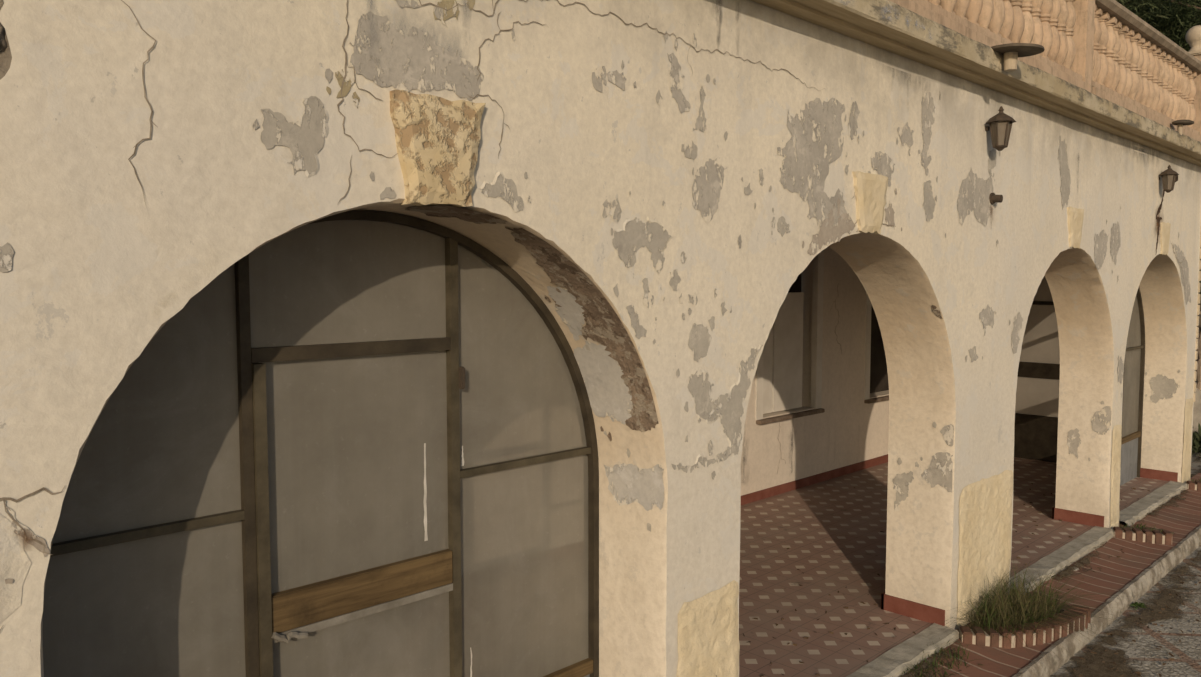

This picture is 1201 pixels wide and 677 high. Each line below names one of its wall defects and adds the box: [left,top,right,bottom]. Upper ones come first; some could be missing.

spalling [0,24,12,80]
crack [124,2,156,208]
crack [337,0,398,205]
peeling [252,0,484,178]
crack [419,0,815,157]
peeling [656,31,724,223]
peeling [741,97,864,255]
spalling [405,171,764,532]
peeling [1145,370,1181,403]
crack [0,486,65,555]
peeling [893,422,954,511]